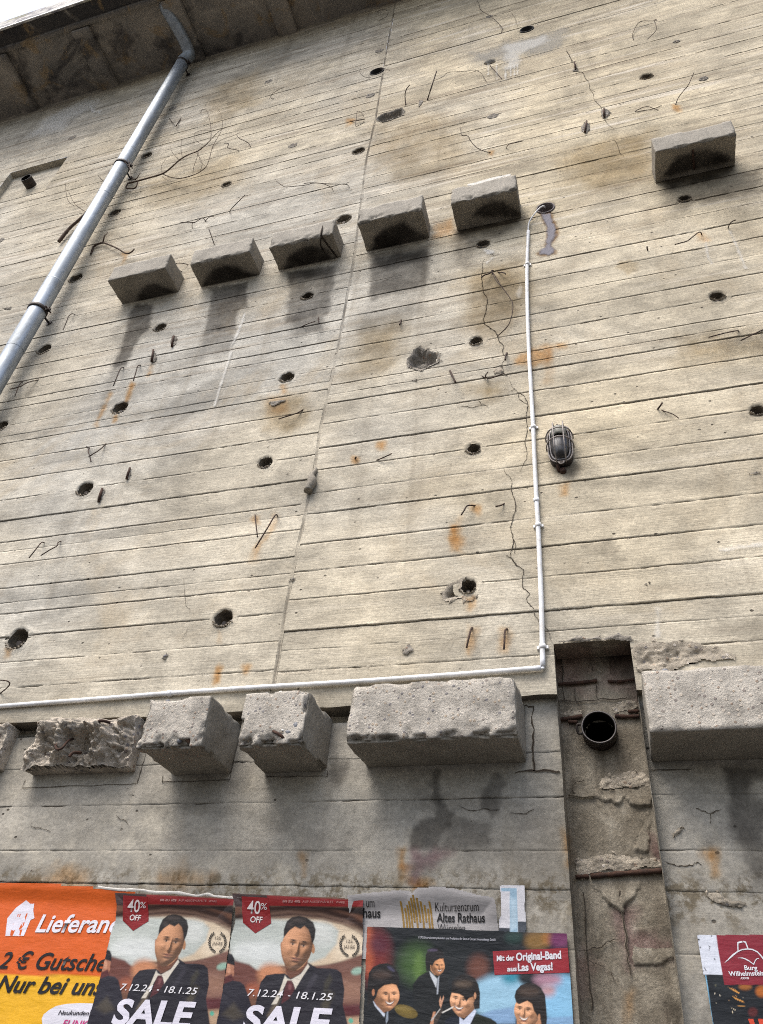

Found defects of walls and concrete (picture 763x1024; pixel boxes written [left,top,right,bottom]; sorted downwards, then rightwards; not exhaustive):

spalling [406,346,442,381]
crack [481,249,552,641]
spalling [440,574,483,604]
spalling [558,633,736,686]
spalling [0,715,145,775]
spalling [569,769,662,914]
crack [578,938,618,981]